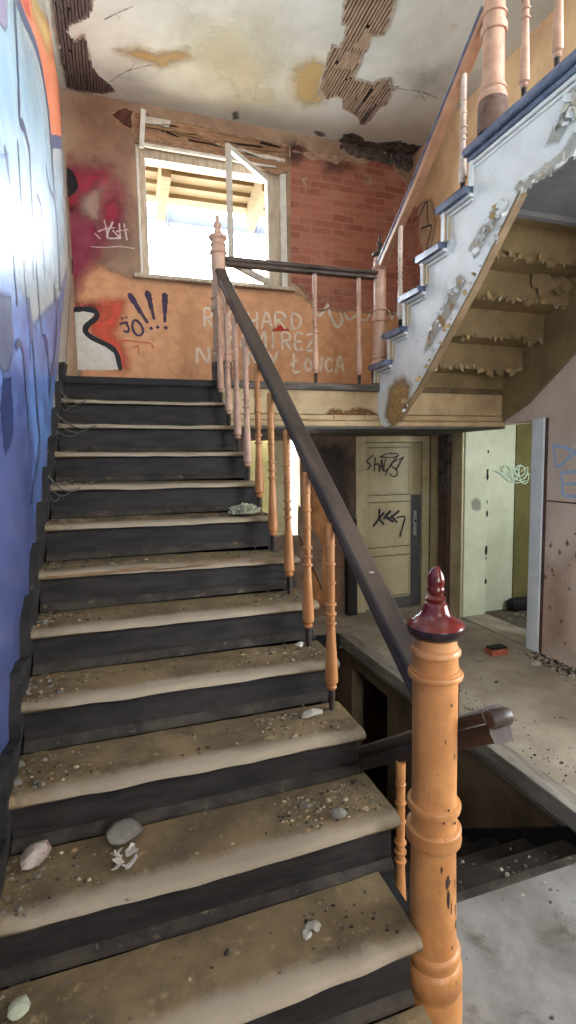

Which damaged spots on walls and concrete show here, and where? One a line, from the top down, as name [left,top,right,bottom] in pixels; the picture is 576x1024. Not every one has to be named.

flaking render [52,0,116,95]
flaking render [110,106,171,131]
water stain [297,62,324,103]
flaking render [215,0,435,315]
peeling [327,89,576,426]